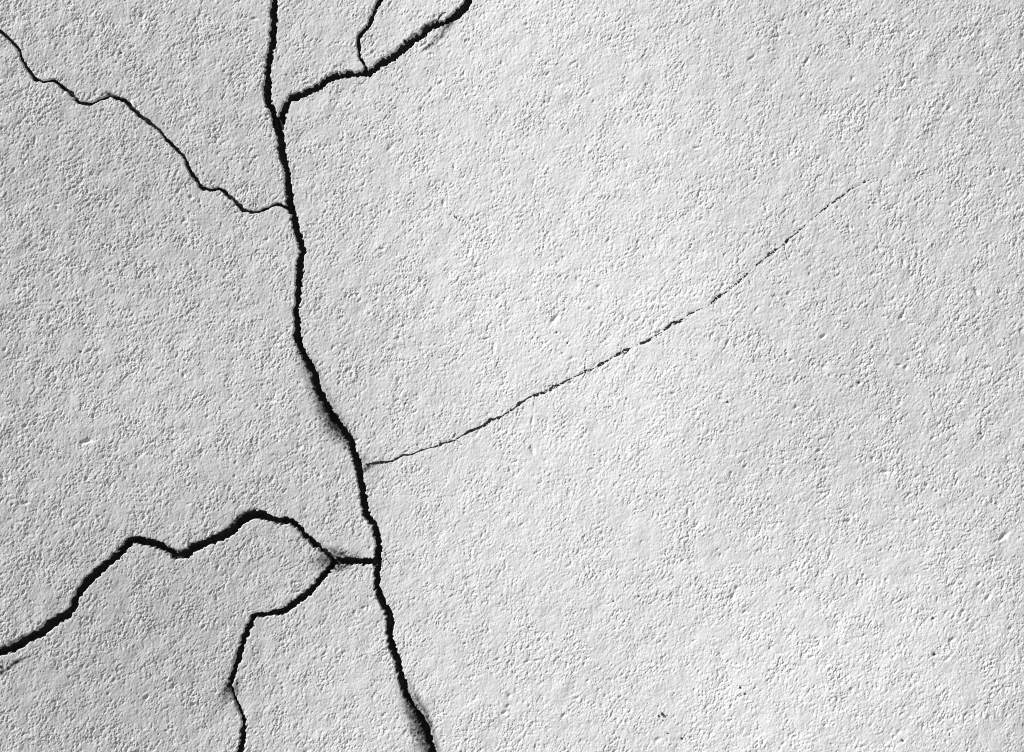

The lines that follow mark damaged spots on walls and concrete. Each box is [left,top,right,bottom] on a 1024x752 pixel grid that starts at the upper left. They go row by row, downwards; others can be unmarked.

crack [0,0,702,752]
crack [711,180,870,304]